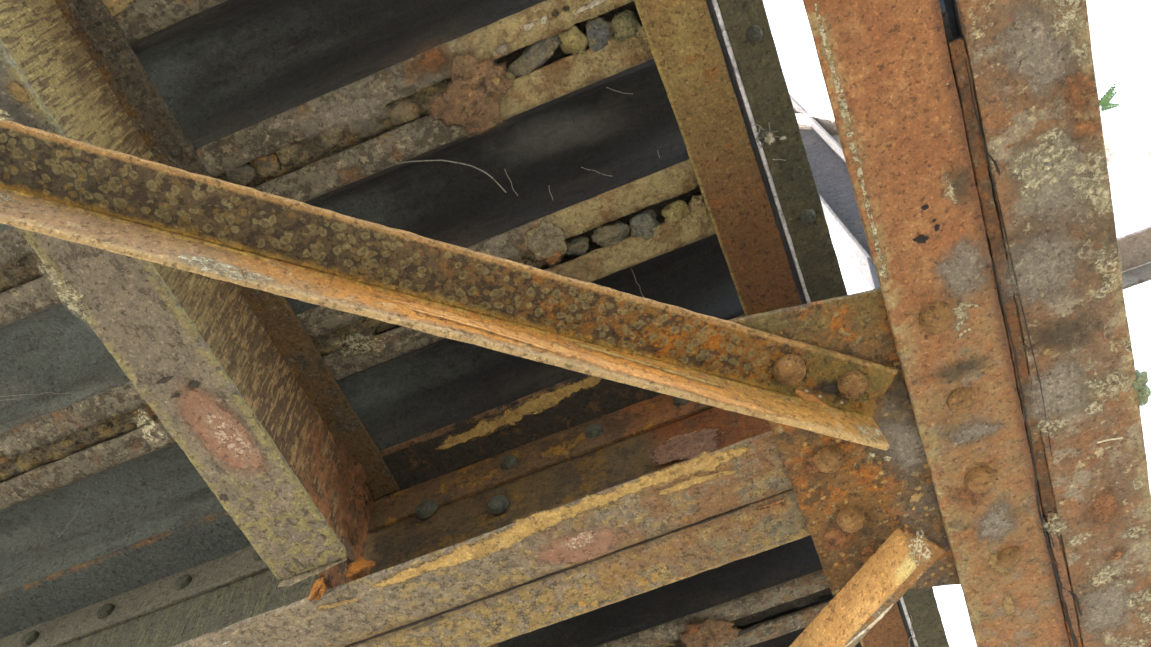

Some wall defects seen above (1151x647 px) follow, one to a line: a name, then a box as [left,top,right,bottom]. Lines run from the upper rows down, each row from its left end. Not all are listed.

corrosion [1059,67,1100,138]
corrosion [381,296,779,449]
corrosion [796,389,844,408]
peeling [373,447,749,587]
corrosion [346,557,375,582]